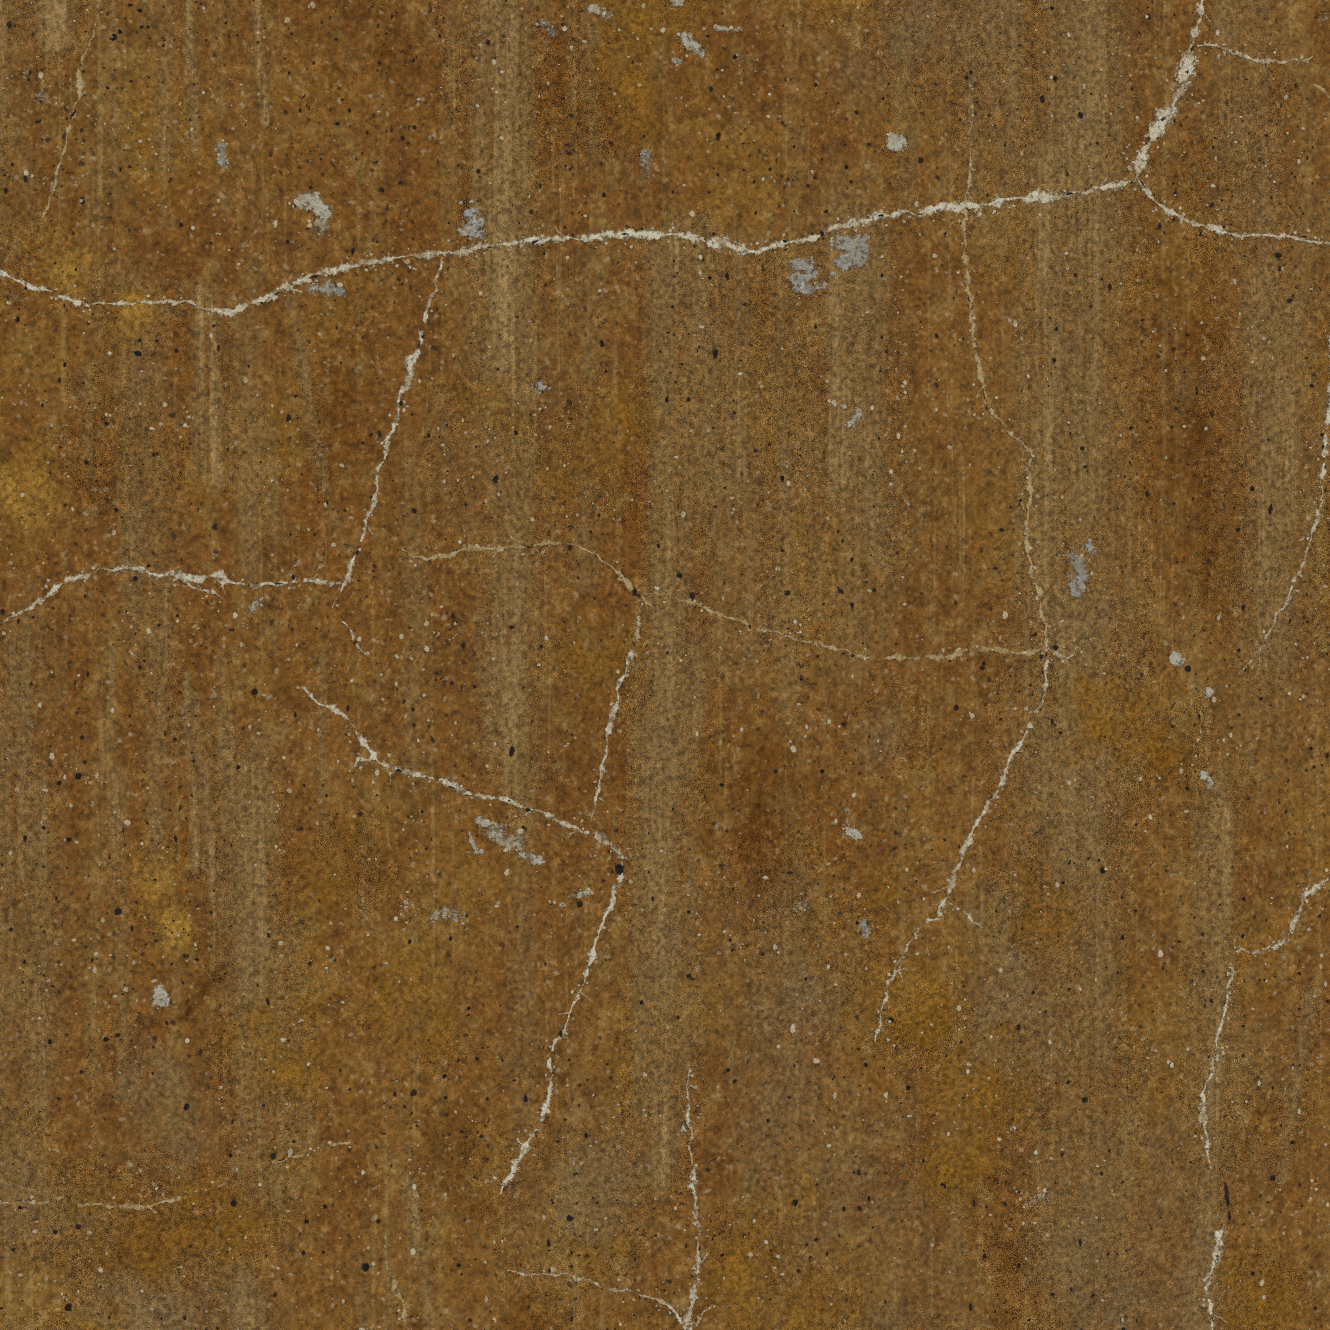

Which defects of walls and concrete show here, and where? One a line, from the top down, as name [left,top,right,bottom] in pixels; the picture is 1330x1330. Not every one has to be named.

corrosion [589,0,658,134]
corrosion [50,249,95,294]
corrosion [120,290,155,327]
corrosion [0,452,63,524]
crack [0,0,1330,1043]
corrosion [129,862,193,951]
crack [296,649,634,1194]
corrosion [885,973,953,1043]
crack [1193,869,1329,1330]
crack [272,1141,351,1168]
crack [0,1181,225,1220]
crack [508,1069,716,1330]